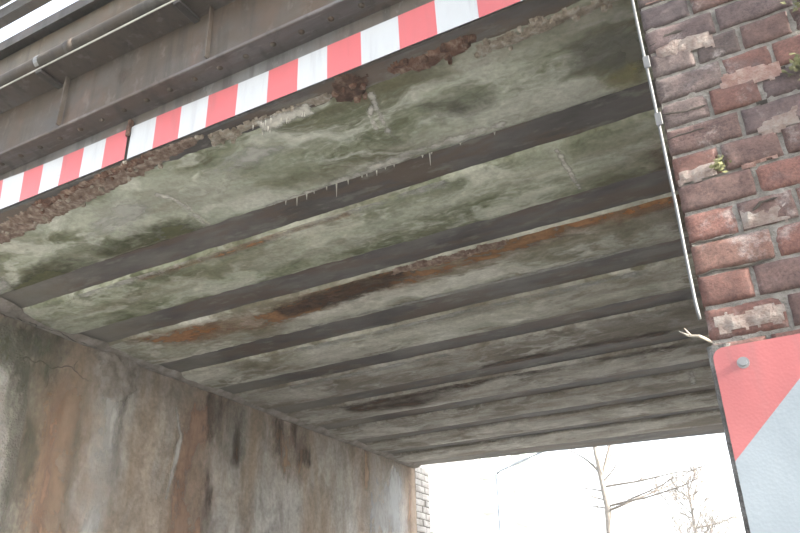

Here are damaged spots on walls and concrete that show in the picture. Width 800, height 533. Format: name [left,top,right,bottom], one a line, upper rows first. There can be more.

leakage [573,31,650,73]
spalling [656,31,715,57]
spalling [720,61,782,89]
leakage [252,104,313,135]
leakage [368,92,389,132]
spalling [0,74,369,244]
leakage [267,158,405,207]
corrosion [144,194,681,343]
spalling [713,303,786,335]
leakage [0,322,62,533]
leakage [170,418,182,482]